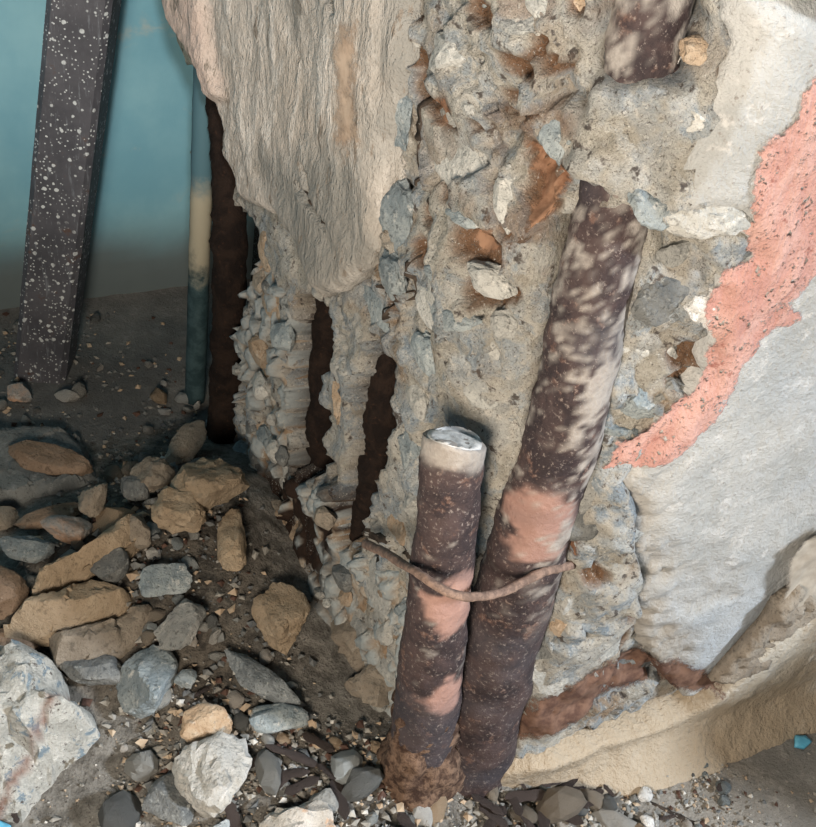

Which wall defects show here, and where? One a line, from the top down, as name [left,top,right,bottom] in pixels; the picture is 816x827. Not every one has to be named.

rust [474,229,500,253]
spalling [162,0,816,812]
rust [518,648,726,740]